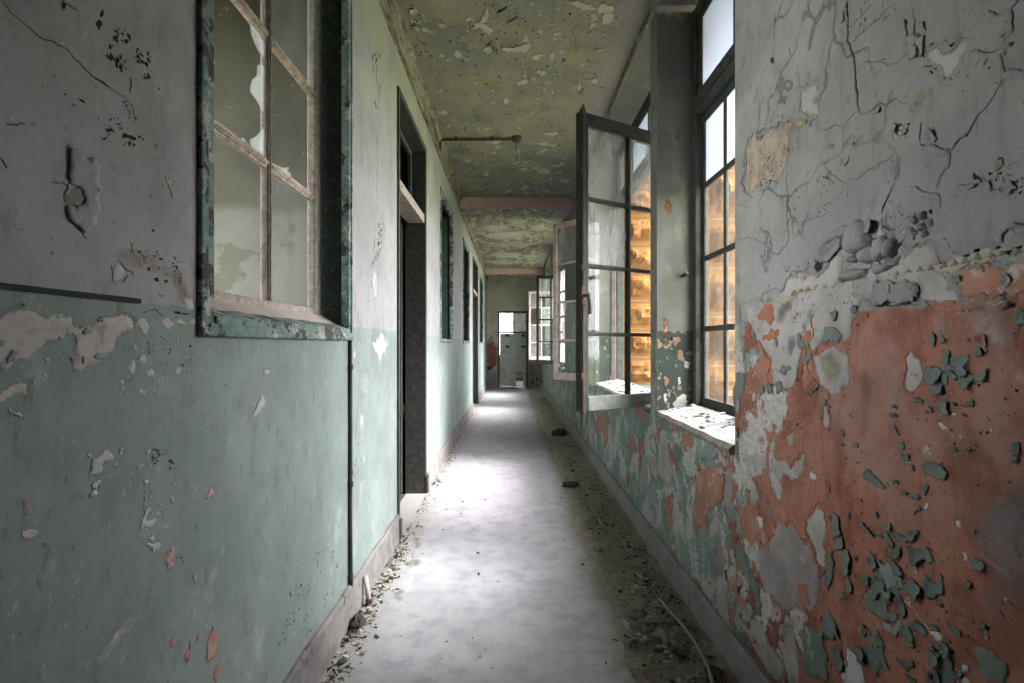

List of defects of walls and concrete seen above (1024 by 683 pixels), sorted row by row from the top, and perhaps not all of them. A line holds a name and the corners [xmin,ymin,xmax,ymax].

crack [2,0,135,122]
peeling [407,0,618,193]
spalling [737,73,843,211]
crack [738,0,1023,278]
peeling [872,2,1017,87]
peeling [473,218,548,264]
flaking render [0,241,195,398]
peeling [734,209,1024,487]
spalling [86,448,123,499]
flaking render [592,334,918,683]
peeling [877,413,964,515]
peeling [898,618,949,683]